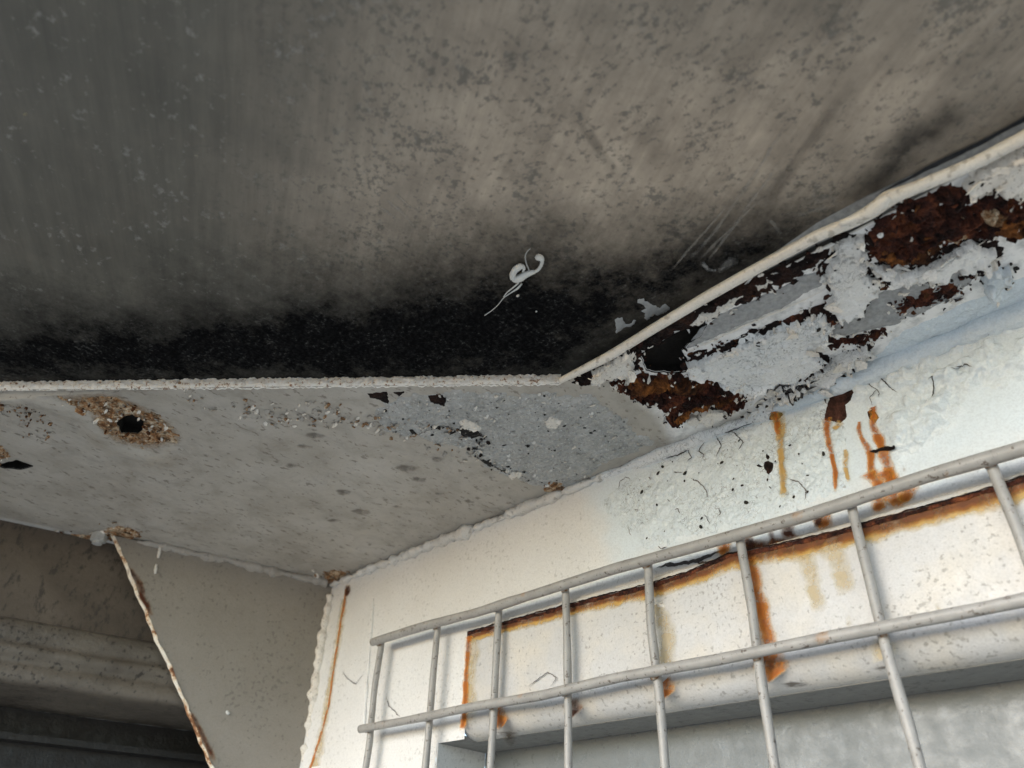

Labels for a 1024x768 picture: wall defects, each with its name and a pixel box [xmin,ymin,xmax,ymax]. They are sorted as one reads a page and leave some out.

rust [864,183,1024,320]
peeling [582,347,640,387]
rust [609,244,892,428]
peeling [680,229,1020,442]
rust [57,396,180,450]
spalling [0,374,561,462]
rust [769,411,786,493]
rust [824,390,897,489]
rust [873,488,915,511]
rust [745,526,806,687]
rust [309,570,350,768]
rust [460,635,475,728]